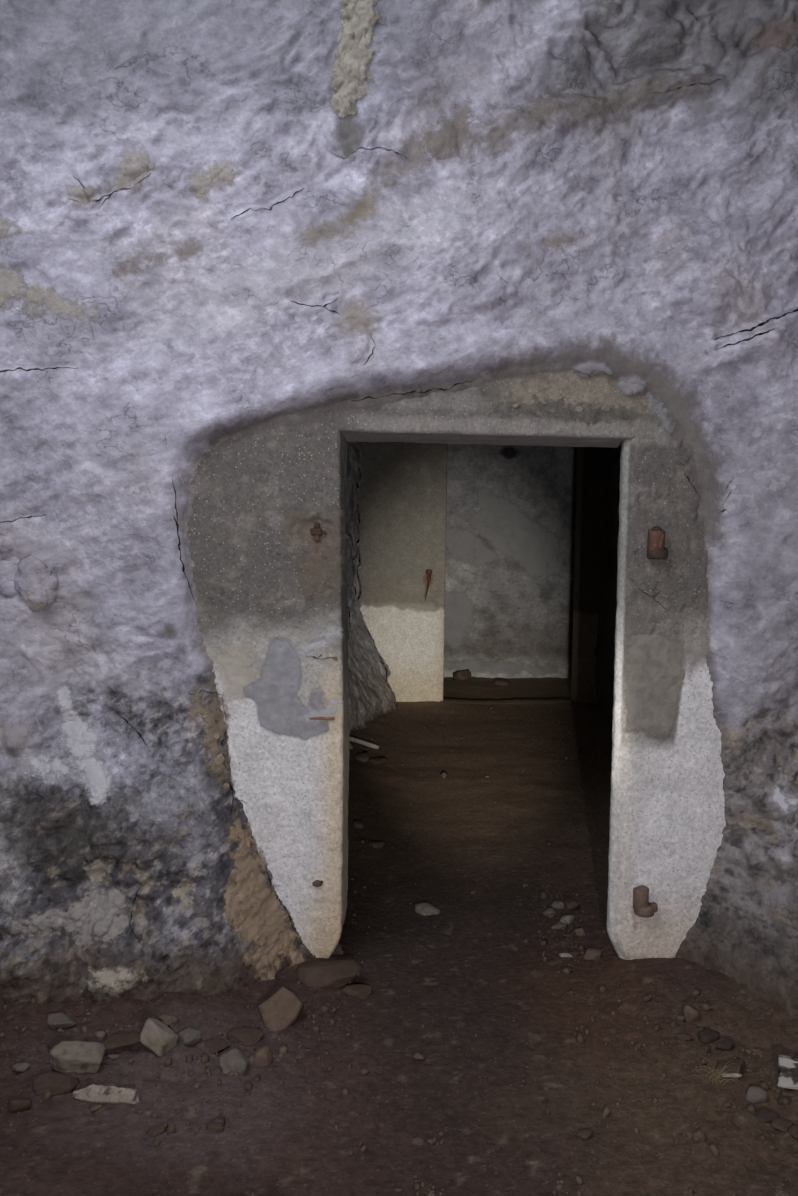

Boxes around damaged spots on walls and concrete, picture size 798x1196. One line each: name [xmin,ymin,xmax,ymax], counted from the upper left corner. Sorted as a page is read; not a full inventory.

damp [335,102,361,158]
crack [714,308,798,349]